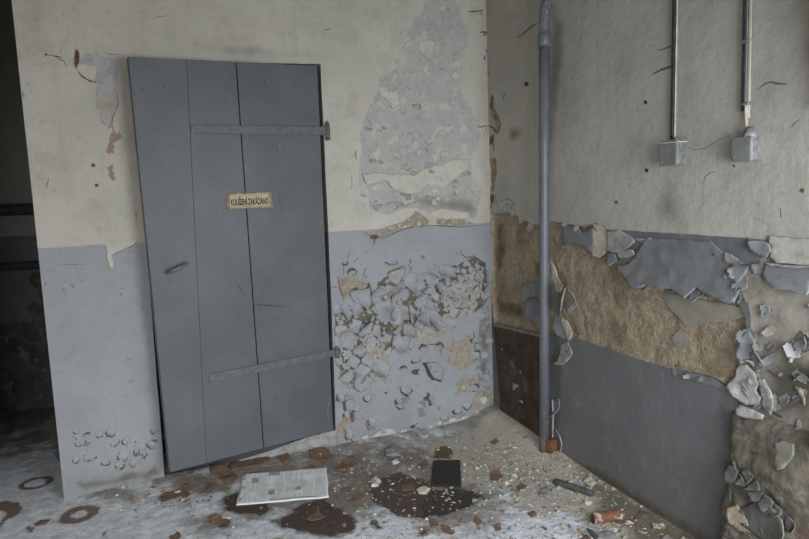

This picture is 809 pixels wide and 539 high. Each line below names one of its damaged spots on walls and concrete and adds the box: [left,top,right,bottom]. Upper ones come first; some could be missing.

spalling [77,52,122,134]
peeling [331,0,539,441]
peeling [0,271,54,413]
spalling [549,221,809,431]
peeling [72,427,158,470]